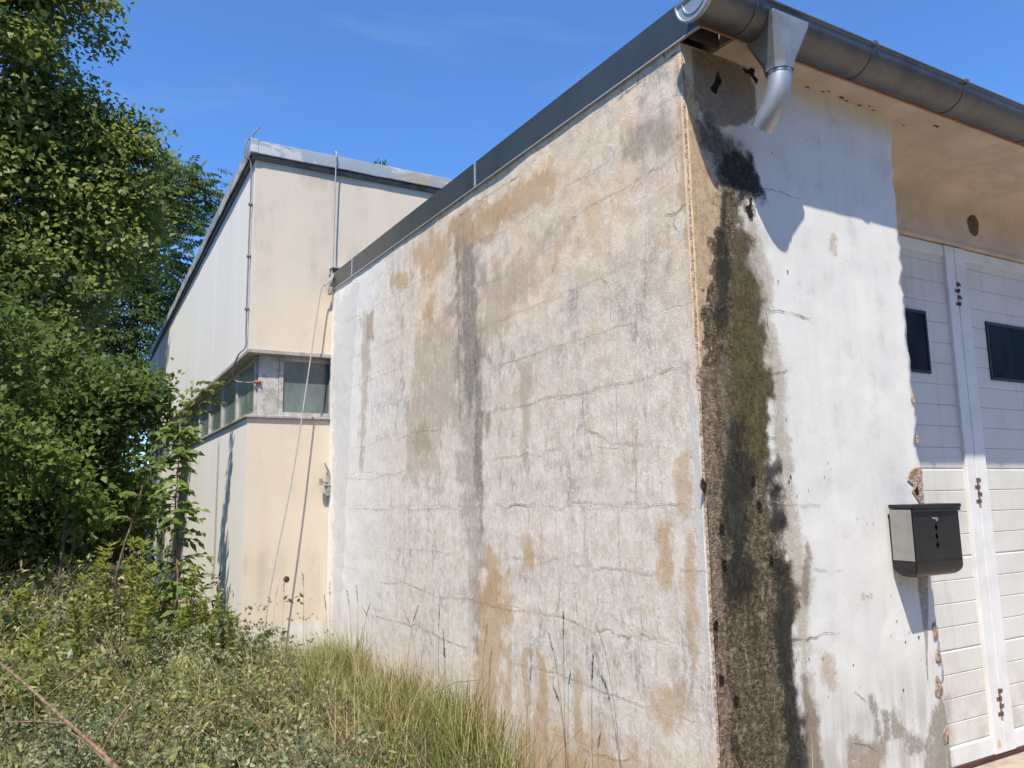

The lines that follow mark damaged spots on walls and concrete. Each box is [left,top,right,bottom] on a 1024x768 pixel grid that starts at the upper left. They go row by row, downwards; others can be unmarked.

flaking render [692,50,758,126]
crack [375,362,834,649]
water stain [698,121,820,768]
spalling [907,466,924,504]
peeling [803,677,822,768]
peeling [848,623,953,768]